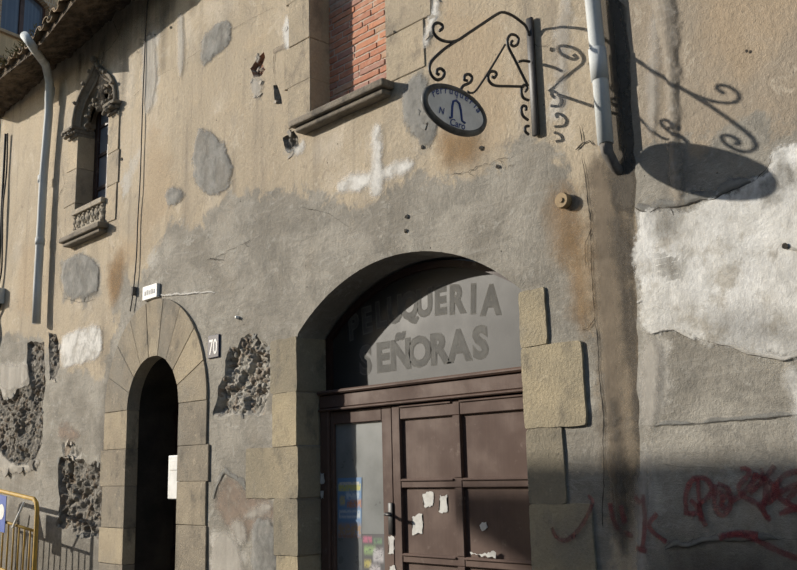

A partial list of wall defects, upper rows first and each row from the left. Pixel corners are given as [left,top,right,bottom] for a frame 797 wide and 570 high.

spalling [250,52,265,98]
spalling [0,332,61,477]
spalling [213,333,270,419]
crack [576,129,605,526]
leakage [588,0,659,570]
peeling [633,143,797,356]
spalling [56,424,103,540]